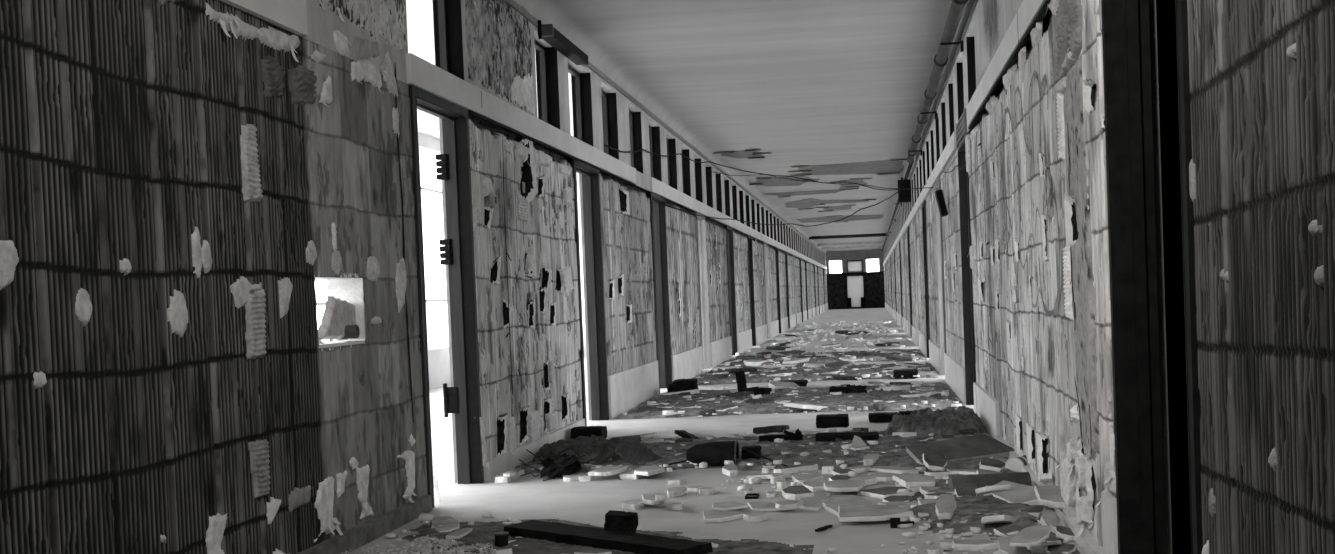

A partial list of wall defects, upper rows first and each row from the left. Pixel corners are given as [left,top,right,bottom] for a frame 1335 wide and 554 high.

peeling [220,15,240,39]
spalling [477,188,496,243]
spalling [507,138,545,223]
spalling [489,251,564,329]
peeling [713,149,770,159]
peeling [750,159,907,236]
spalling [968,239,1033,343]
spalling [1039,70,1065,180]
spalling [1041,195,1079,321]
spalling [1084,80,1105,128]
spalling [484,362,569,469]
spalling [1015,404,1112,537]